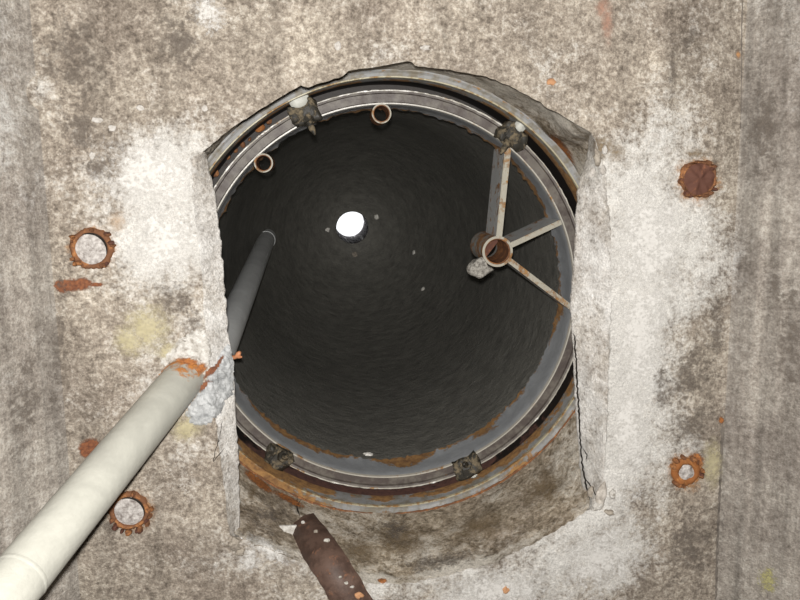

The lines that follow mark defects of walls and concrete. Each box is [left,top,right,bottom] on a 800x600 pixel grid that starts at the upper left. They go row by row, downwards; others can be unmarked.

rust [677,152,718,198]
rust [54,278,103,293]
rust [177,356,224,391]
crack [573,334,596,500]
rust [78,439,99,457]
rust [669,453,719,488]
rust [105,503,154,536]